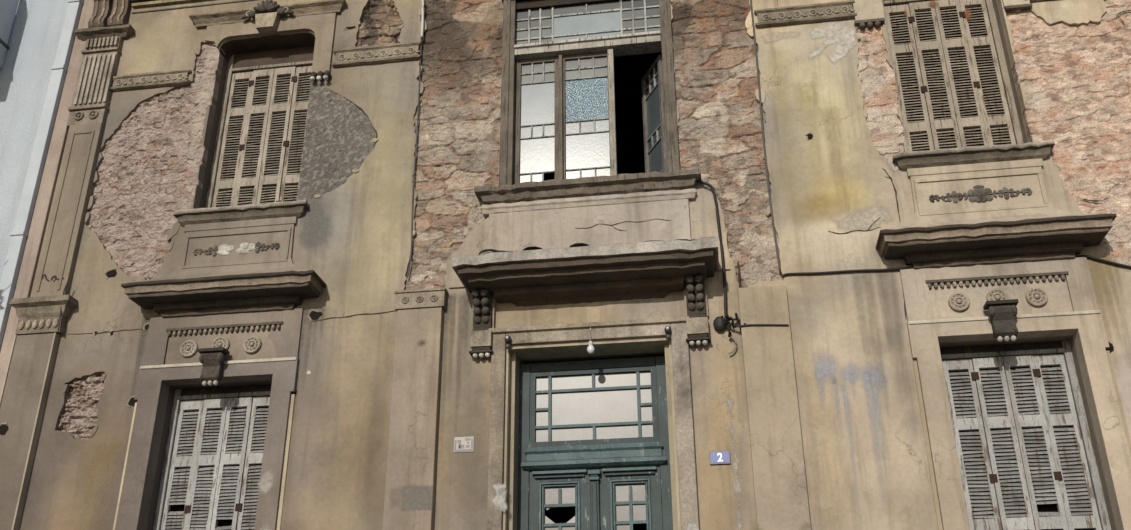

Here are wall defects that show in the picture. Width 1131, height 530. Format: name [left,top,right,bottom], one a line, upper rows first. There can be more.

flaking render [84,43,225,282]
flaking render [297,80,378,201]
flaking render [344,0,405,47]
flaking render [405,0,503,290]
crack [588,219,671,231]
flaking render [670,0,905,288]
flaking render [1006,0,1131,271]
flaking render [58,373,106,440]